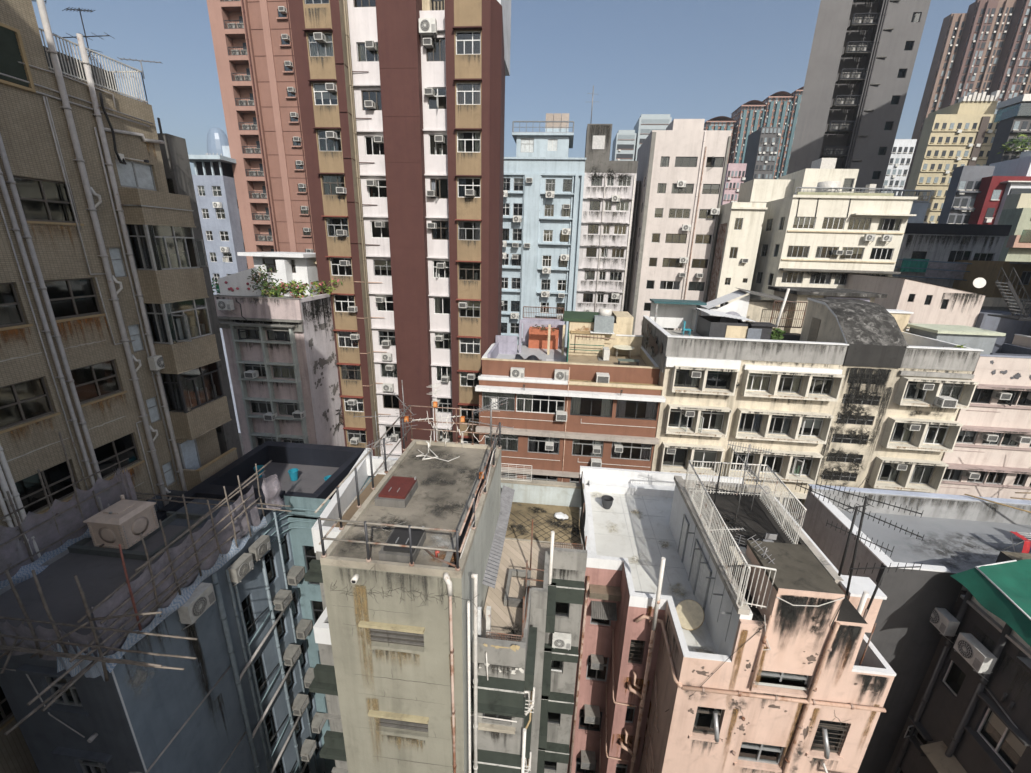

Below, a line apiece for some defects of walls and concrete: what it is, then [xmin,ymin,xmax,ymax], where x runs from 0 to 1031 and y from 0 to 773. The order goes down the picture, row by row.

spalling [309,319,343,436]
leakage [744,361,892,487]
leakage [759,595,835,631]
leakage [829,625,862,658]
leakage [858,674,887,695]